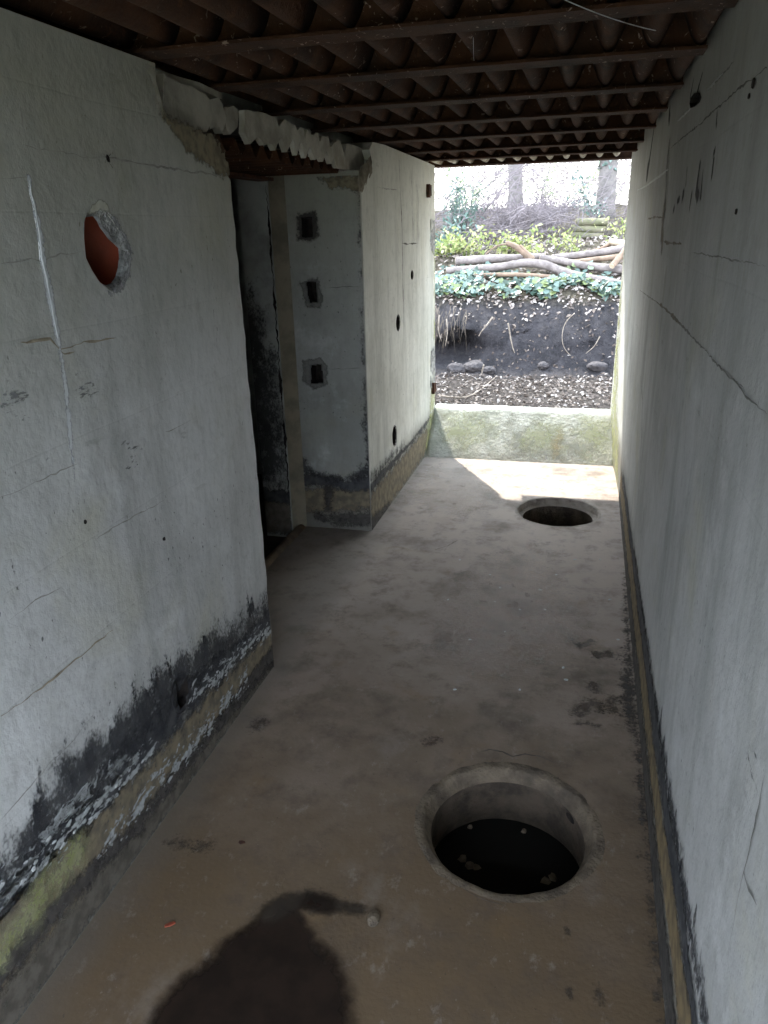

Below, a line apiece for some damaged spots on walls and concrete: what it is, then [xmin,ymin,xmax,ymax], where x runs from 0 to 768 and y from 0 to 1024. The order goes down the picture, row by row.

spalling [163,115,230,178]
spalling [317,156,372,195]
crack [671,62,767,148]
spalling [84,200,133,296]
crack [648,216,765,267]
crack [640,290,767,414]
water stain [303,383,434,530]
water stain [0,592,274,995]
water stain [567,473,709,1024]